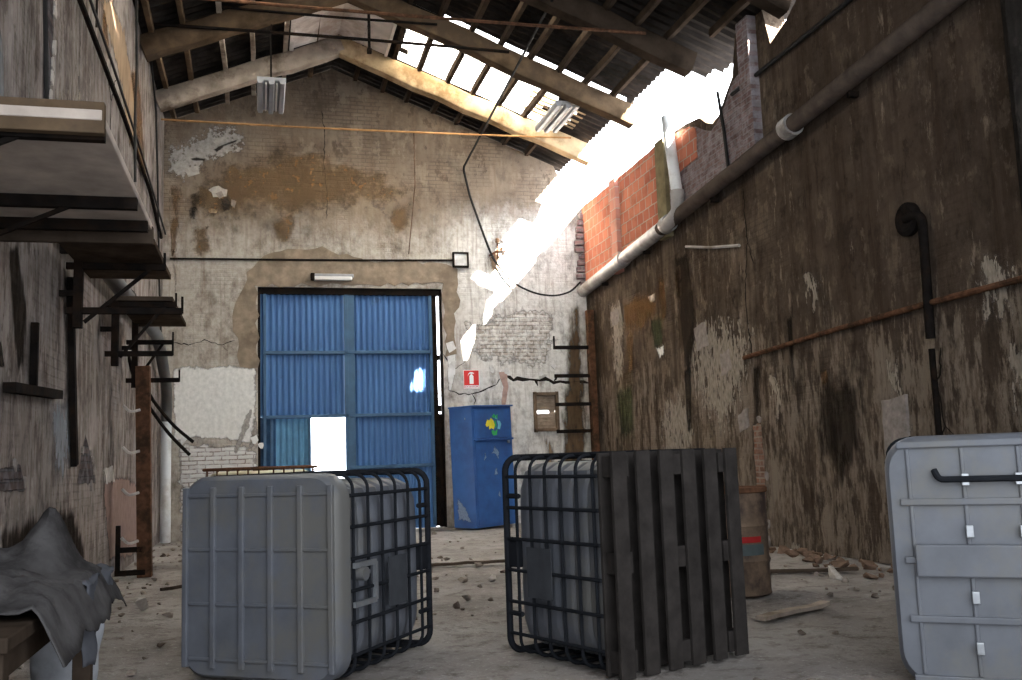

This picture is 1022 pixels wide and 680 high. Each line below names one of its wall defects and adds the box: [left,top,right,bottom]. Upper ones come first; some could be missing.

peeling [168,126,245,181]
spalling [446,302,556,390]
crack [443,354,588,404]
water stain [819,378,863,487]
spalling [0,459,27,492]
spalling [178,435,264,513]